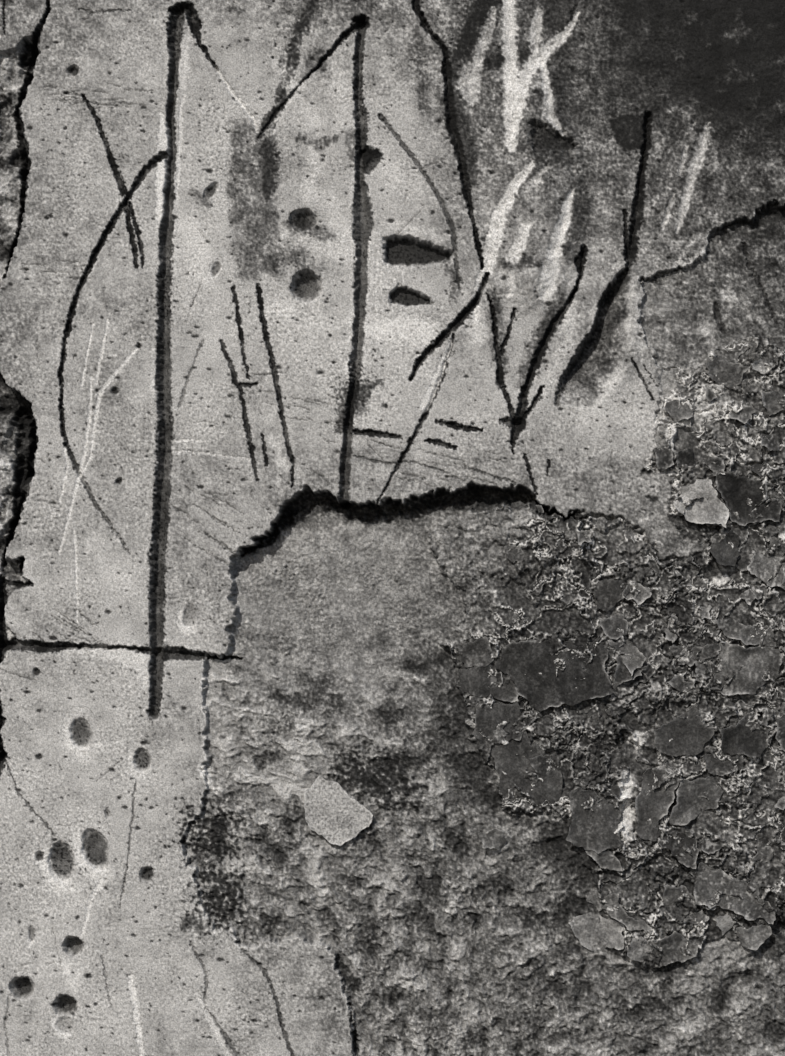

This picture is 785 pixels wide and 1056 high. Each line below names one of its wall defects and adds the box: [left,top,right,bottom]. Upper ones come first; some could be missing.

spalling [0,37,40,287]
crack [741,239,779,324]
spalling [0,372,36,601]
spalling [1,622,16,663]
spalling [202,189,785,1056]